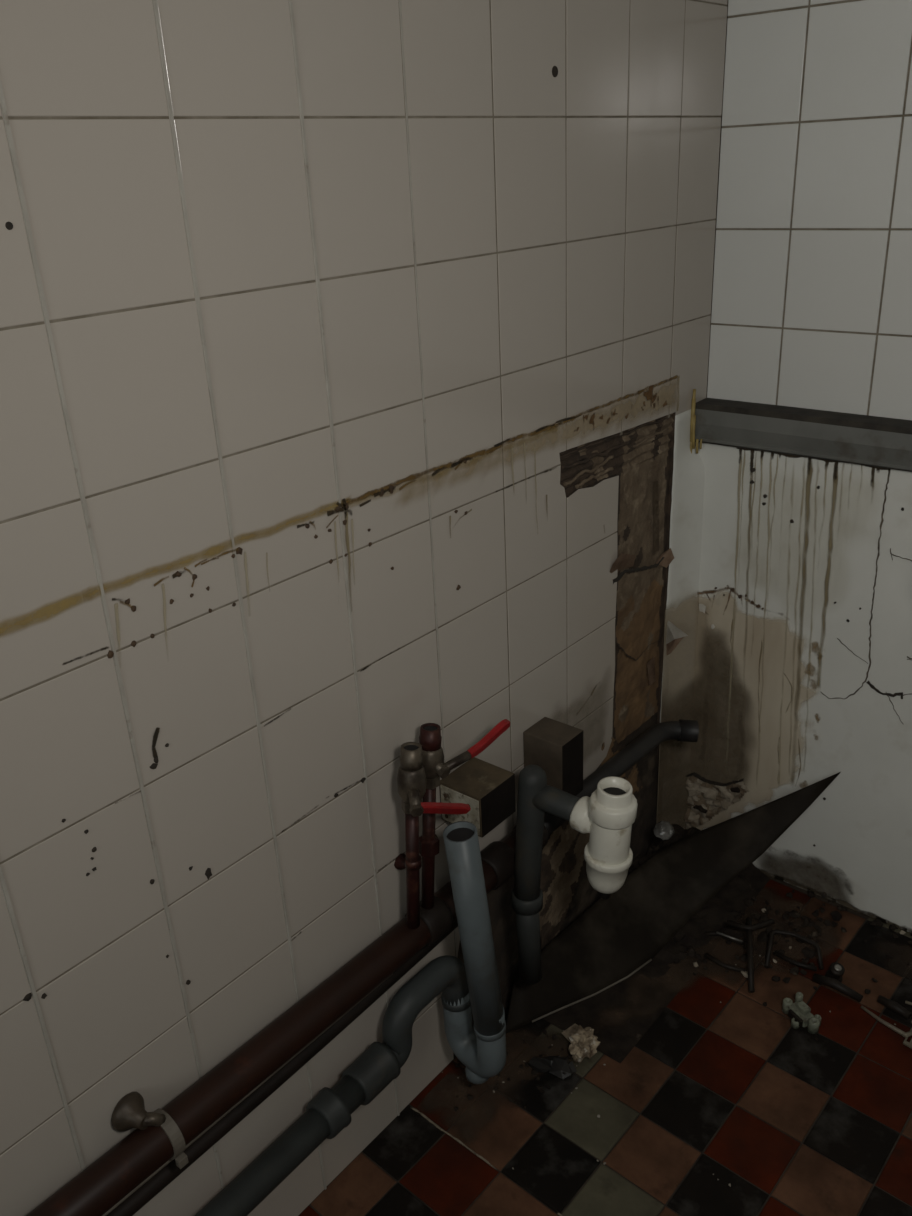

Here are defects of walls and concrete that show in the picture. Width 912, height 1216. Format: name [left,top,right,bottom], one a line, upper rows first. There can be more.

spalling [559,413,822,863]
crack [821,470,912,724]
spalling [486,875,519,1005]
spalling [539,821,600,952]
water stain [761,853,851,902]